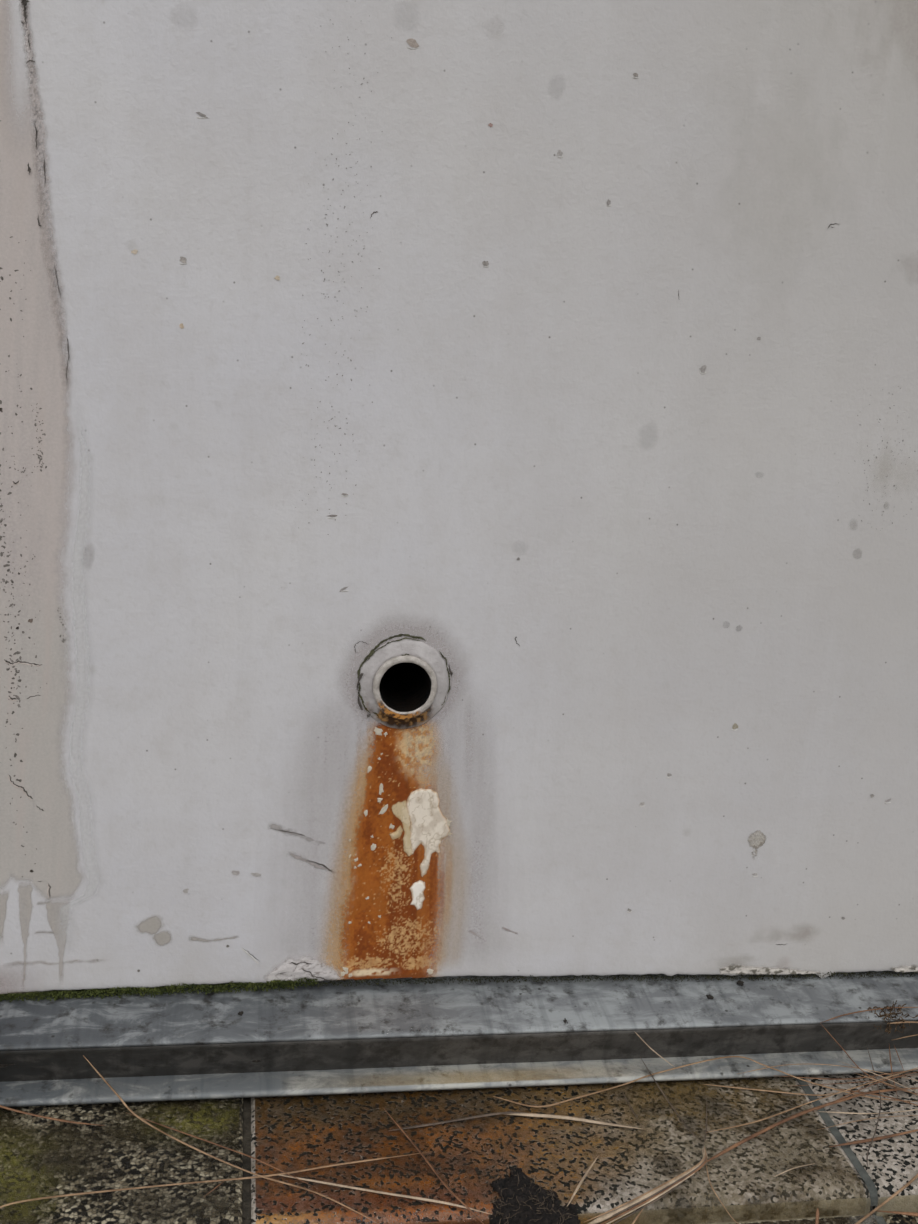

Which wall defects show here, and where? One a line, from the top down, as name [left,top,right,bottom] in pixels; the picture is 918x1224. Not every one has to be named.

damp [0,0,96,976]
corrosion [327,702,444,980]